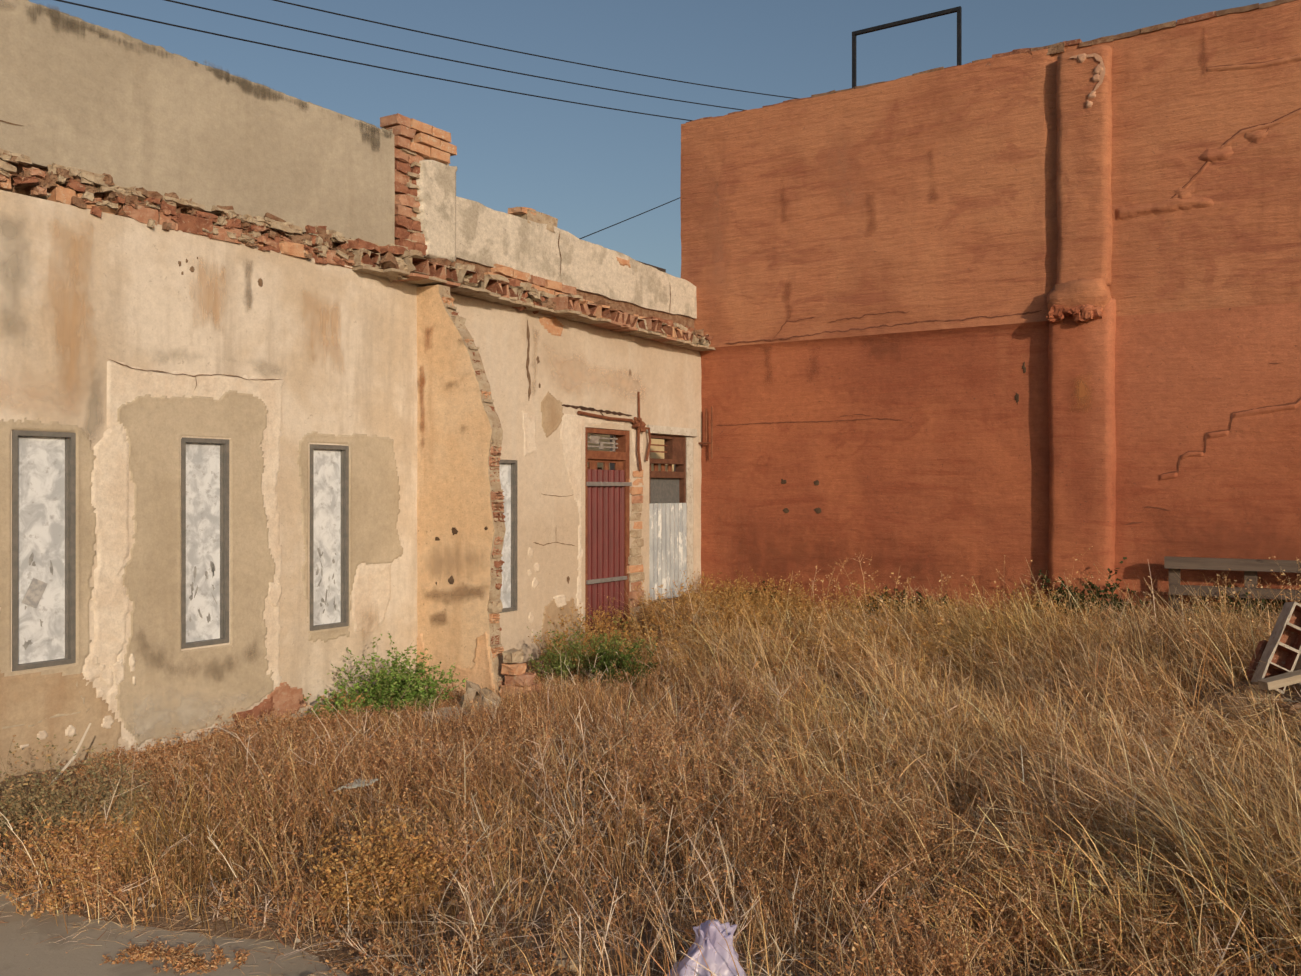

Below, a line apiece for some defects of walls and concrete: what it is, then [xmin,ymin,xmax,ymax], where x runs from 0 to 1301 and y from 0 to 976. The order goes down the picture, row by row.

peeling [1070,53,1105,108]
crack [1162,108,1301,202]
spalling [426,284,496,422]
crack [724,310,1042,344]
crack [1125,397,1301,525]
peeling [0,361,308,781]
peeling [297,431,403,643]
spalling [452,436,506,695]